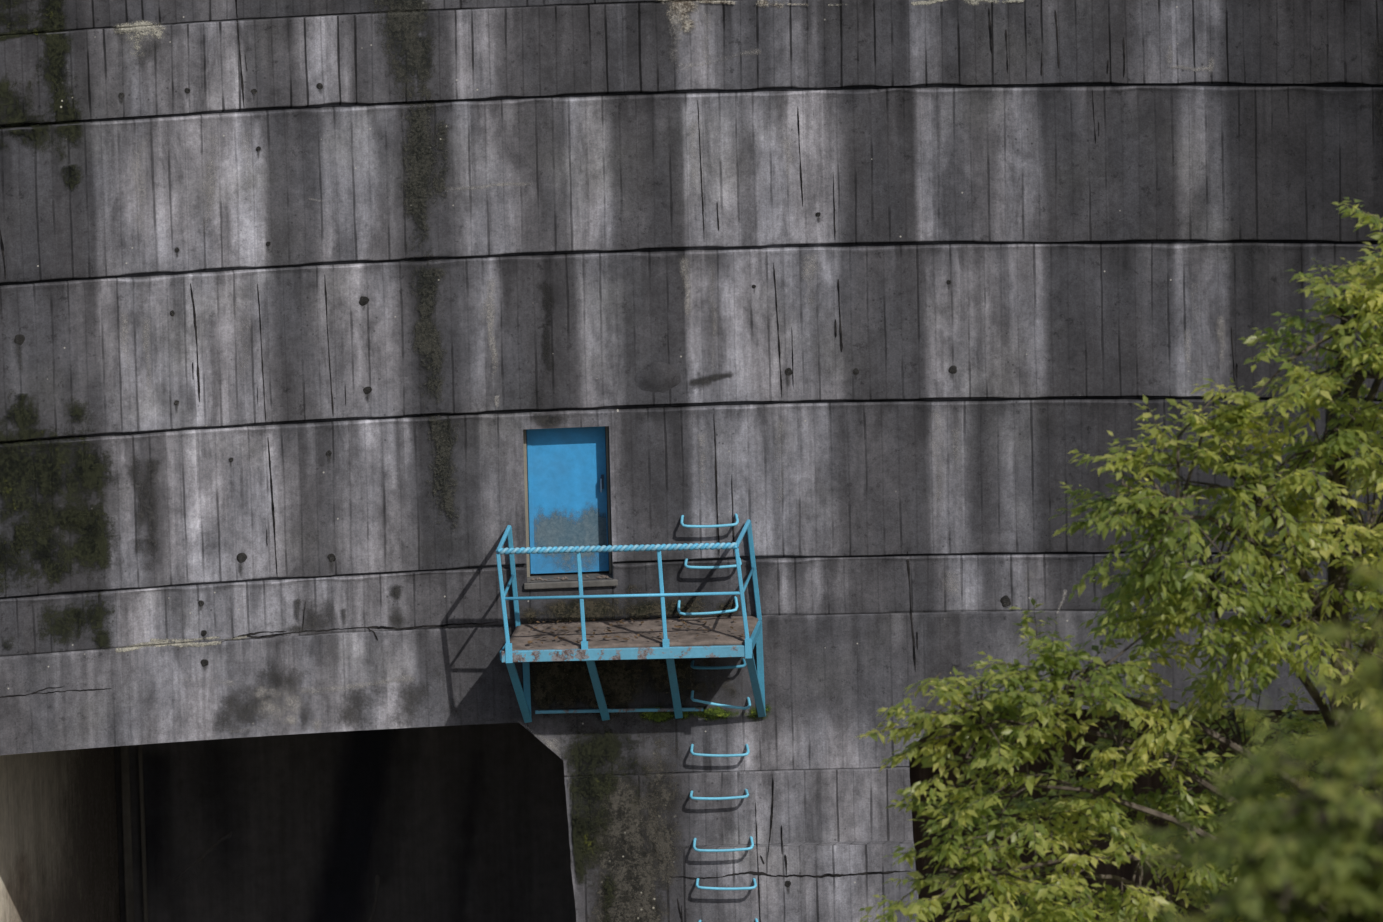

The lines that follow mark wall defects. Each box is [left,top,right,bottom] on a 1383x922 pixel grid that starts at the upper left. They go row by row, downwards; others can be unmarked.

water stain [374,0,460,530]
peeling [534,507,607,569]
crack [0,687,111,698]
water stain [590,723,681,922]
crack [669,780,905,922]